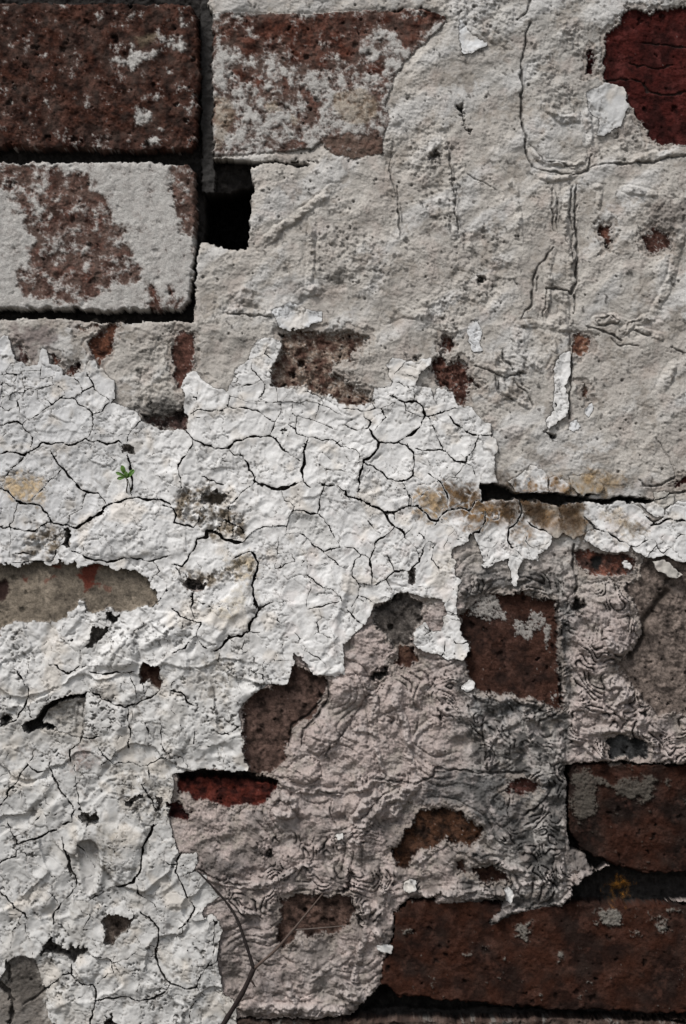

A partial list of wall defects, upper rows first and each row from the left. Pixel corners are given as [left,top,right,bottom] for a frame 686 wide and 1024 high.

crack [517,0,686,421]
spalling [585,6,686,147]
crack [0,618,247,1024]
crack [320,791,344,829]
crack [0,349,686,758]
peeling [0,301,686,1024]
crack [370,716,539,787]